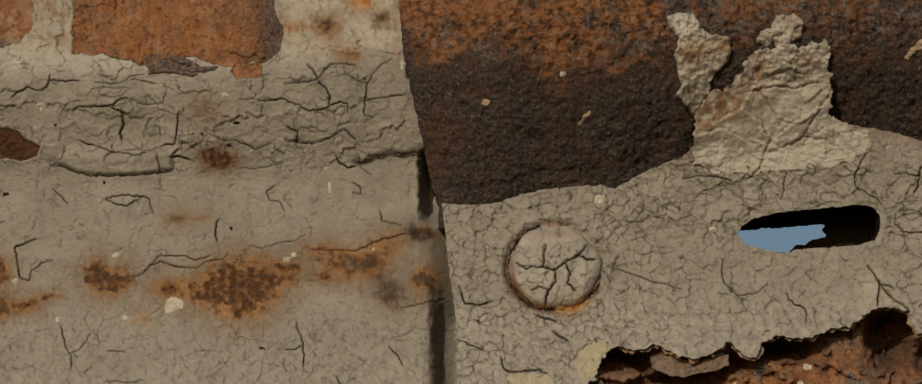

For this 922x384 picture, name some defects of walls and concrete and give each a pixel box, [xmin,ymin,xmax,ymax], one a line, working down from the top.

peeling [667,12,872,177]
crack [0,74,189,212]
crack [218,59,423,205]
corrosion [0,258,60,322]
corrosion [80,256,135,299]
corrosion [154,249,304,323]
corrosion [303,223,440,308]
crack [517,245,674,340]
crack [464,341,545,373]
peeling [507,373,555,384]
peeling [577,340,610,382]
peeling [650,351,729,377]